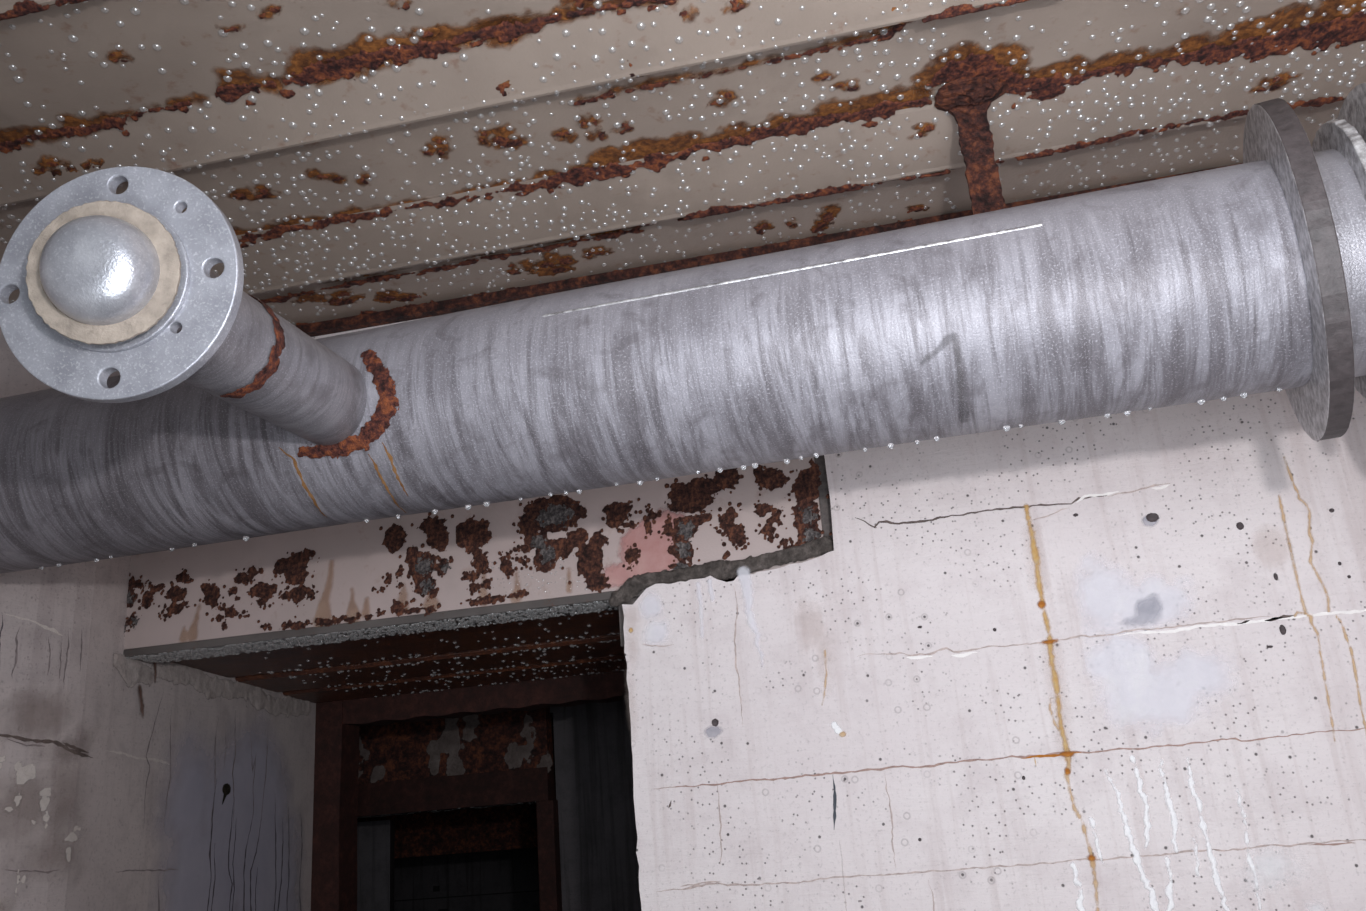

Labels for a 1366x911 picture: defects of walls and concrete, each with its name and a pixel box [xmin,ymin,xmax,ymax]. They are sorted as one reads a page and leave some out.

corrosion [0,0,698,176]
corrosion [228,0,1366,248]
corrosion [220,223,652,398]
crack [0,734,170,765]
spalling [605,510,834,606]
crack [656,839,1366,892]
crack [659,728,1364,827]
crack [855,483,1170,528]
corrosion [1024,505,1099,911]
crack [857,609,1366,659]
damp [1105,755,1230,911]
corrosion [1279,466,1366,728]